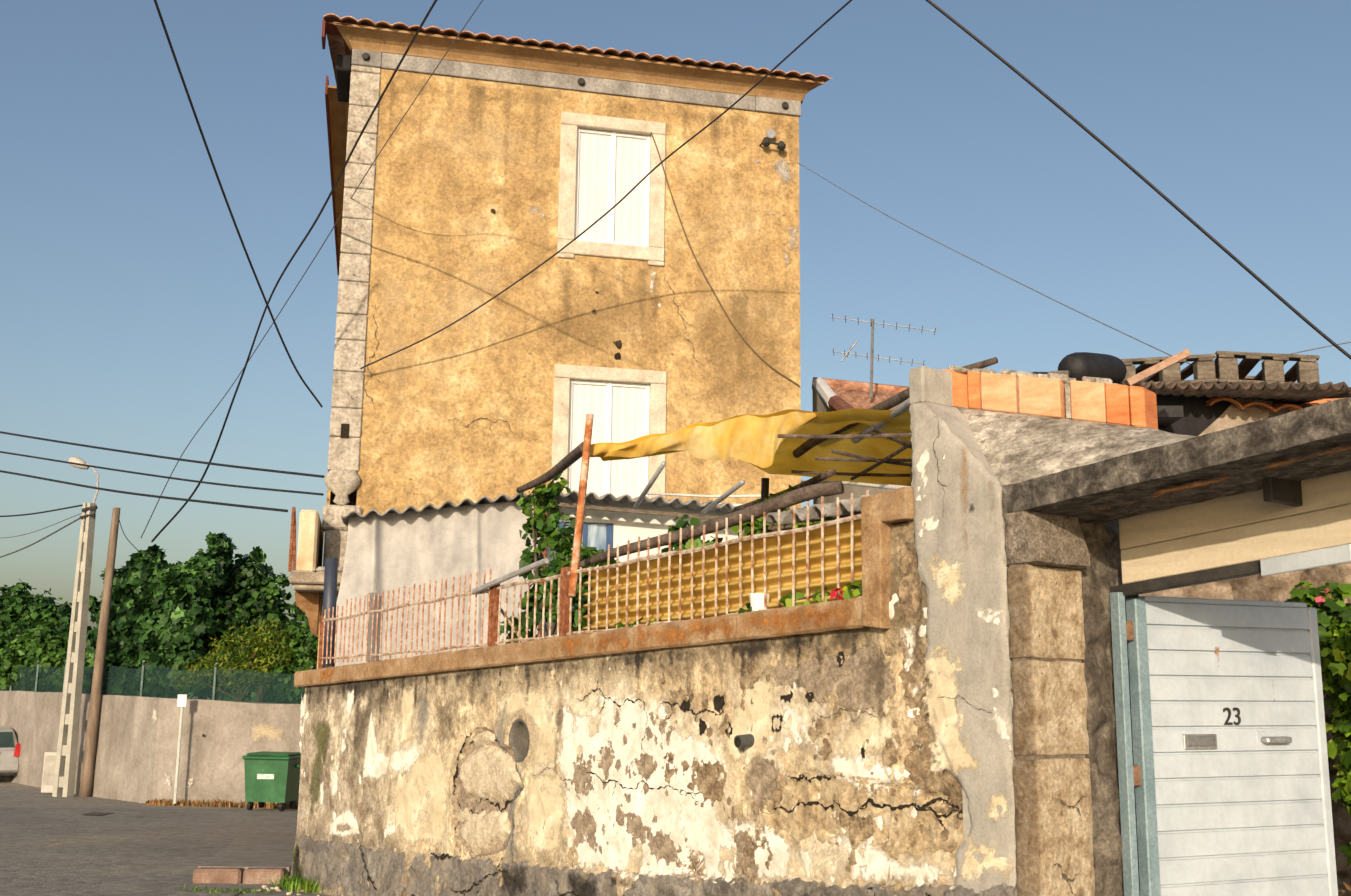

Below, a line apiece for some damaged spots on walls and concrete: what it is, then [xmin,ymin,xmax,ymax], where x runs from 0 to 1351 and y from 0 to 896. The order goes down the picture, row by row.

peeling [915,448,945,501]
peeling [299,694,309,752]
peeling [301,516,1014,896]
crack [428,678,963,896]
leakage [507,785,520,854]
leakage [501,867,527,896]
leakage [568,874,595,896]